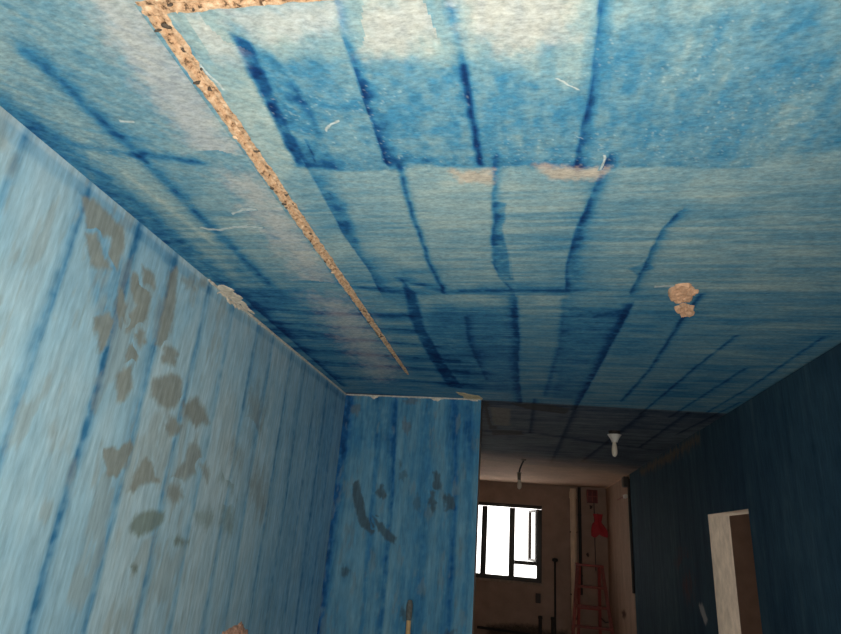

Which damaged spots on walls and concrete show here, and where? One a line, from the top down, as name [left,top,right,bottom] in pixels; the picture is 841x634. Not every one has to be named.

spalling [668,283,699,318]
flaking render [78,191,255,542]
flaking render [222,621,248,634]